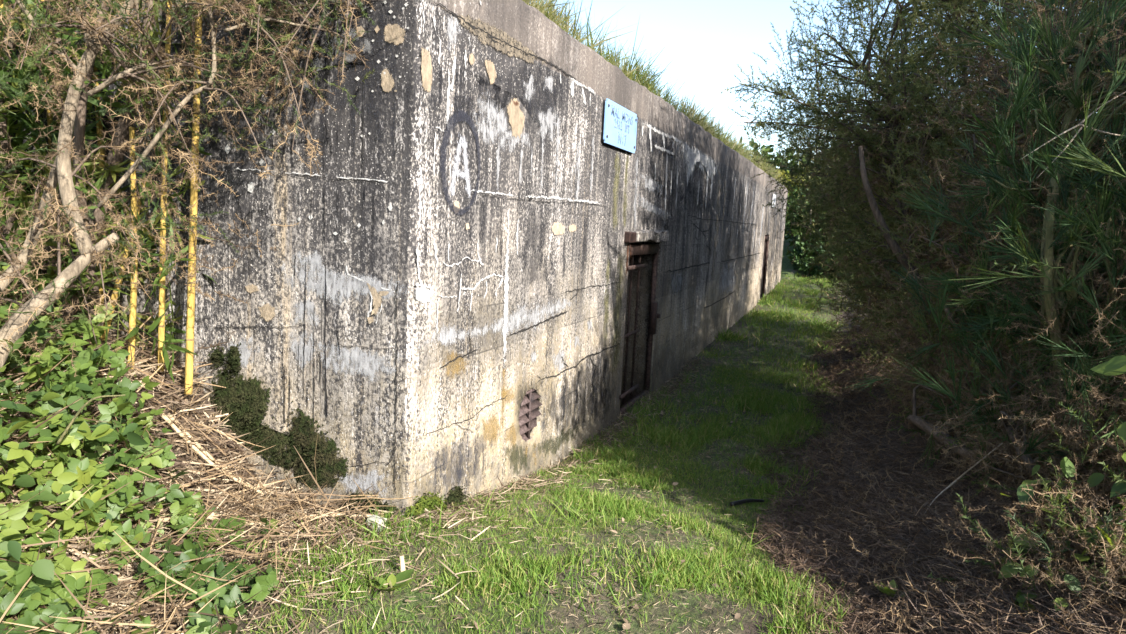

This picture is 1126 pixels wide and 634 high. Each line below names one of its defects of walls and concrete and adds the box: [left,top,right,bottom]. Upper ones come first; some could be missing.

spalling [355,24,406,45]
spalling [381,69,397,92]
spalling [421,48,433,93]
efflorescence [423,11,470,175]
spalling [458,13,545,84]
spalling [507,98,525,138]
efflorescence [474,95,560,189]
damp [282,123,567,424]
crack [510,282,622,335]
crack [440,336,478,368]
crack [537,344,620,383]
damp [507,427,578,474]